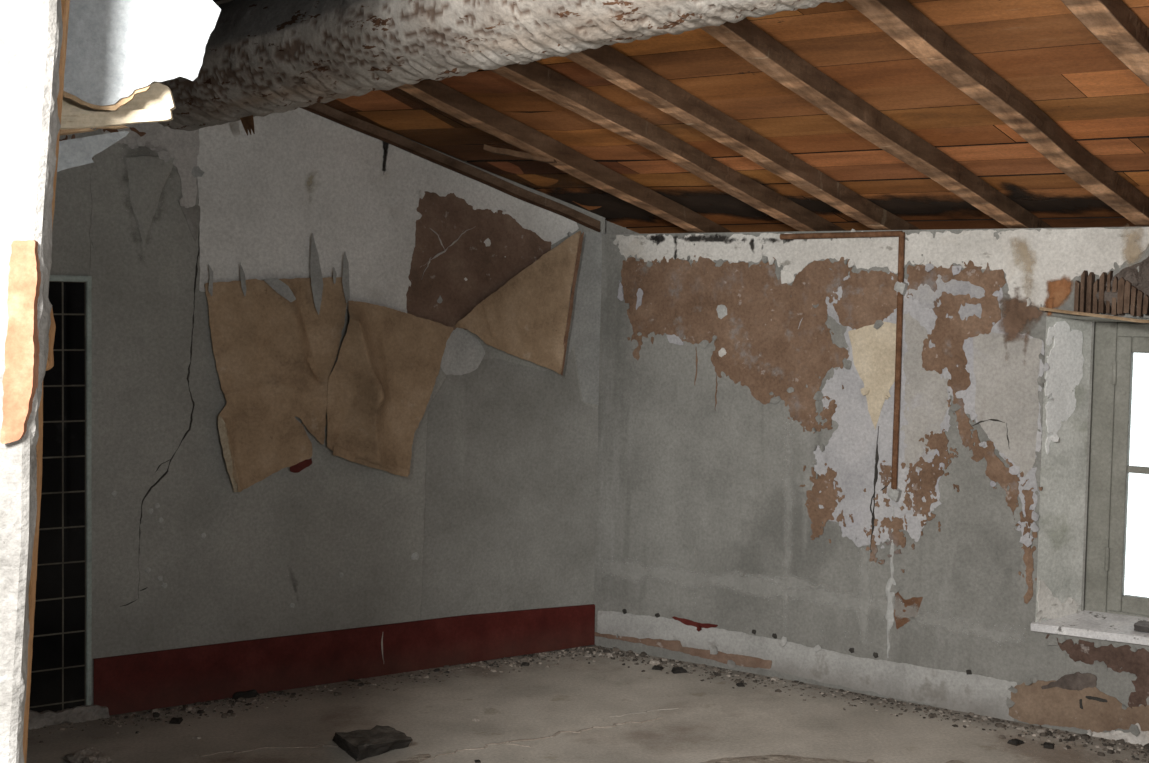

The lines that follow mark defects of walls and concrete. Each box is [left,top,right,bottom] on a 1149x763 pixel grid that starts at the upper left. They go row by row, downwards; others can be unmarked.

flaking render [103,127,146,137]
crack [120,199,200,607]
flaking render [179,107,1149,737]
spalling [701,755,875,763]